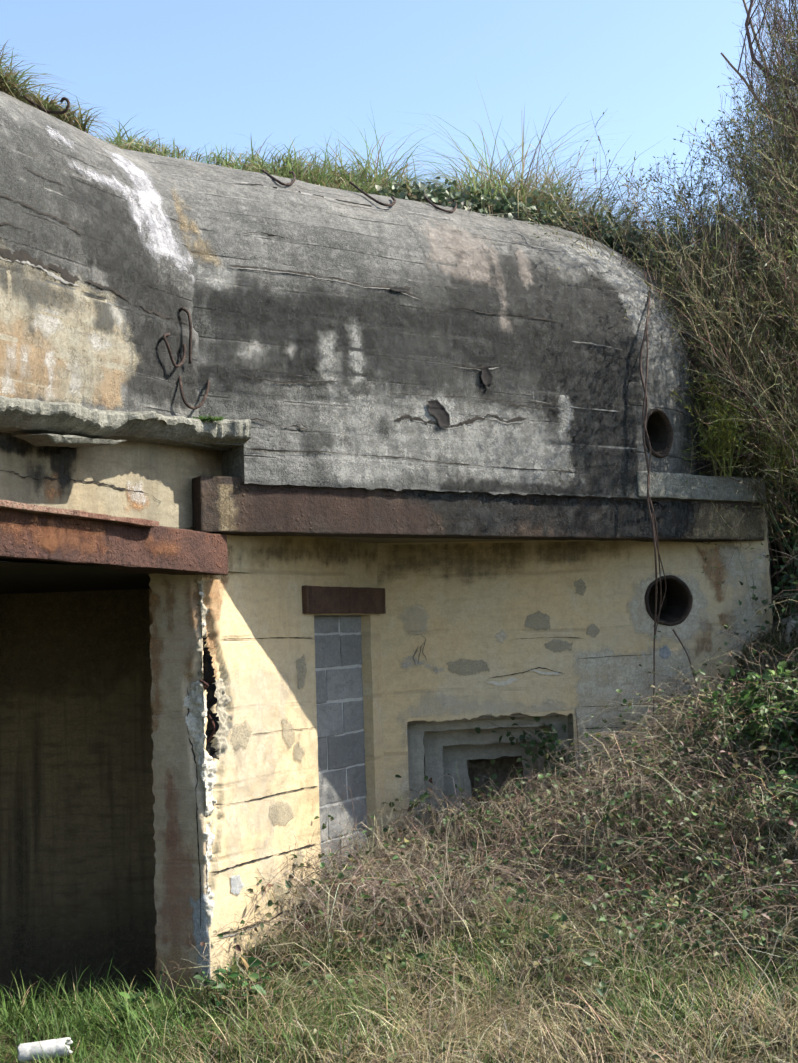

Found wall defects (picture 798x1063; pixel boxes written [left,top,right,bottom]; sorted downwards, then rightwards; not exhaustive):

damp [0,129,697,578]
spalling [427,399,450,428]
crack [393,403,564,429]
crack [0,470,161,502]
rust [219,484,237,531]
rust [10,517,103,550]
spalling [183,581,233,927]